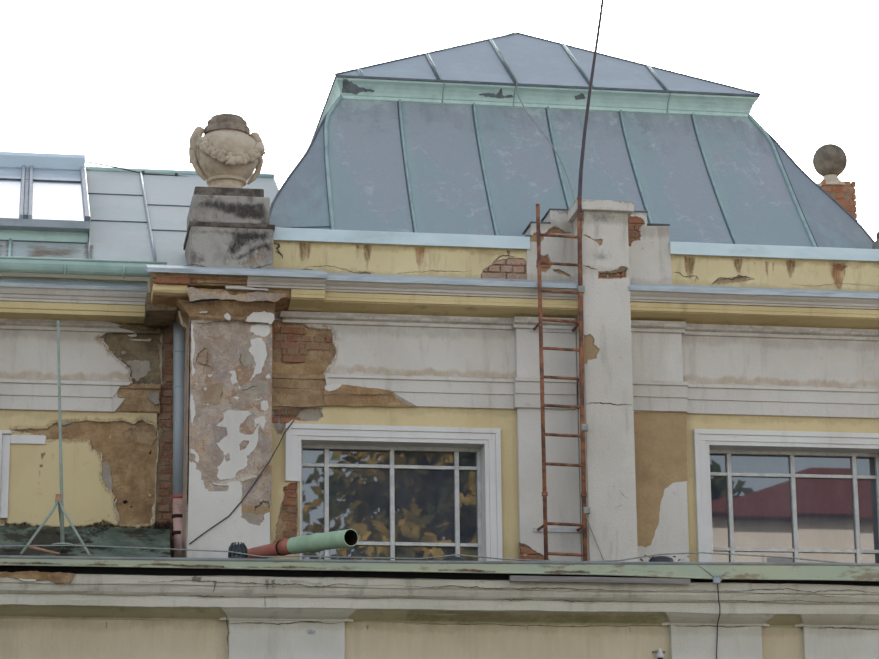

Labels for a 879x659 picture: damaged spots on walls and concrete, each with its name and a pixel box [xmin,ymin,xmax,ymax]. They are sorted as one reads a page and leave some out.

leakage [201,201,264,218]
leakage [230,232,269,262]
flaking render [530,226,571,242]
flaking render [628,216,645,246]
flaking render [481,254,571,280]
flaking render [597,266,628,279]
crack [674,272,755,282]
flaking render [583,334,600,364]
flaking render [12,326,174,557]
peeling [187,311,336,558]
peeling [634,412,688,548]